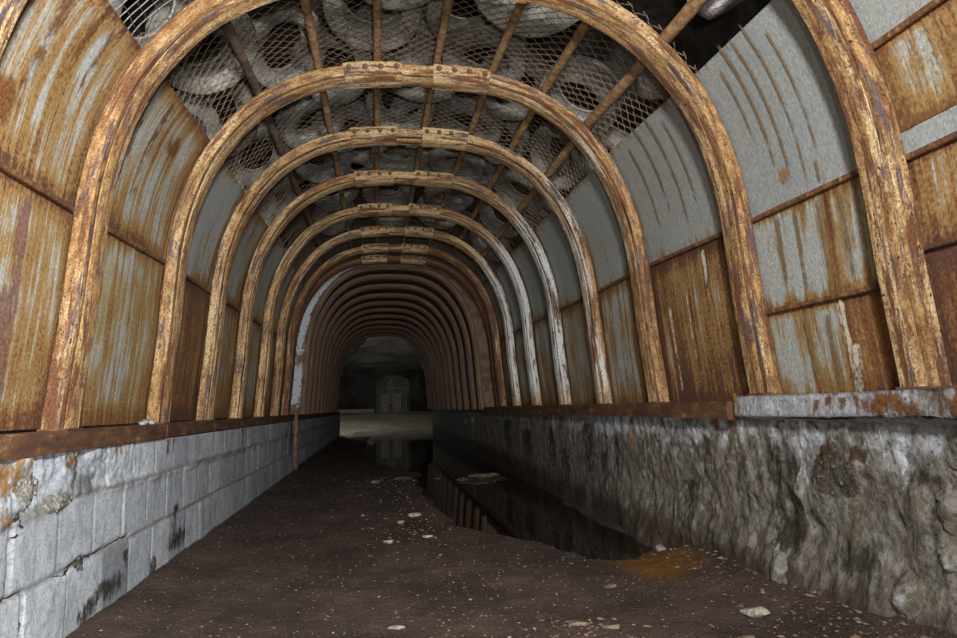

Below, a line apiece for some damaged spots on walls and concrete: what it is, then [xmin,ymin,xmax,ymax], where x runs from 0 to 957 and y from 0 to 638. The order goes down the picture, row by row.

rust [0,0,75,121]
rust [719,41,789,183]
rust [774,219,788,281]
rust [793,211,807,285]
rust [0,197,32,393]
rust [826,315,842,386]
rust [812,390,921,433]
rust [937,388,957,417]
rust [0,458,34,530]
crack [8,504,32,542]
crack [54,534,127,577]
damp [77,549,128,624]